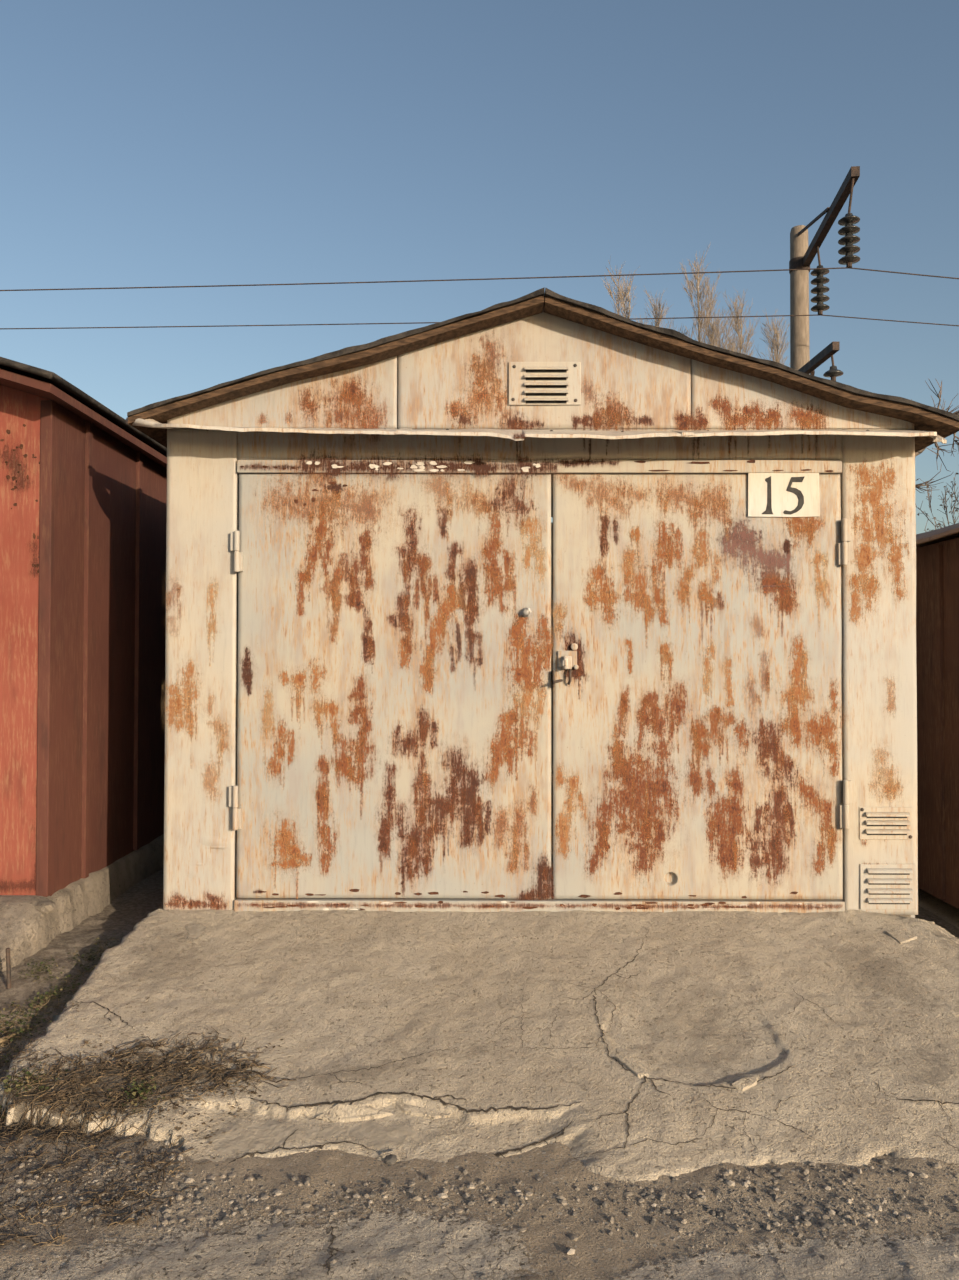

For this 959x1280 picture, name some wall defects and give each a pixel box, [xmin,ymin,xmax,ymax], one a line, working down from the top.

rust [287,378,387,440]
rust [445,330,544,457]
rust [571,384,654,460]
rust [675,395,826,460]
rust [849,460,909,624]
rust [166,473,842,910]
rust [887,679,896,713]
rust [870,750,899,799]
crack [229,932,825,1163]
crack [875,1082,959,1165]